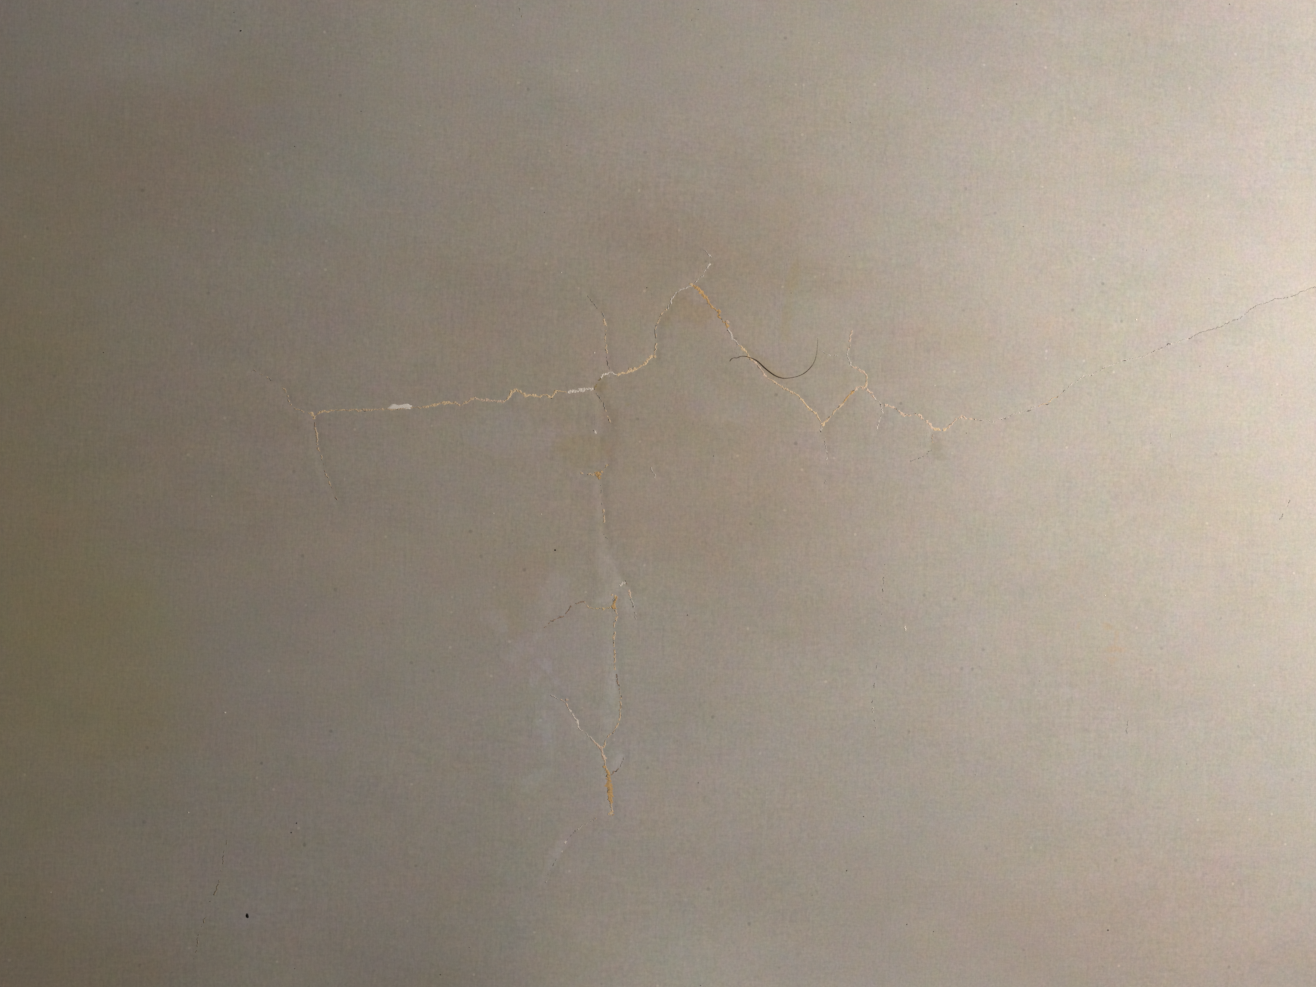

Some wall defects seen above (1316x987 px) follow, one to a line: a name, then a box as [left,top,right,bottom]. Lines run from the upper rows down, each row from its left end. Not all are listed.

crack [253,263,1316,500]
crack [544,580,636,882]